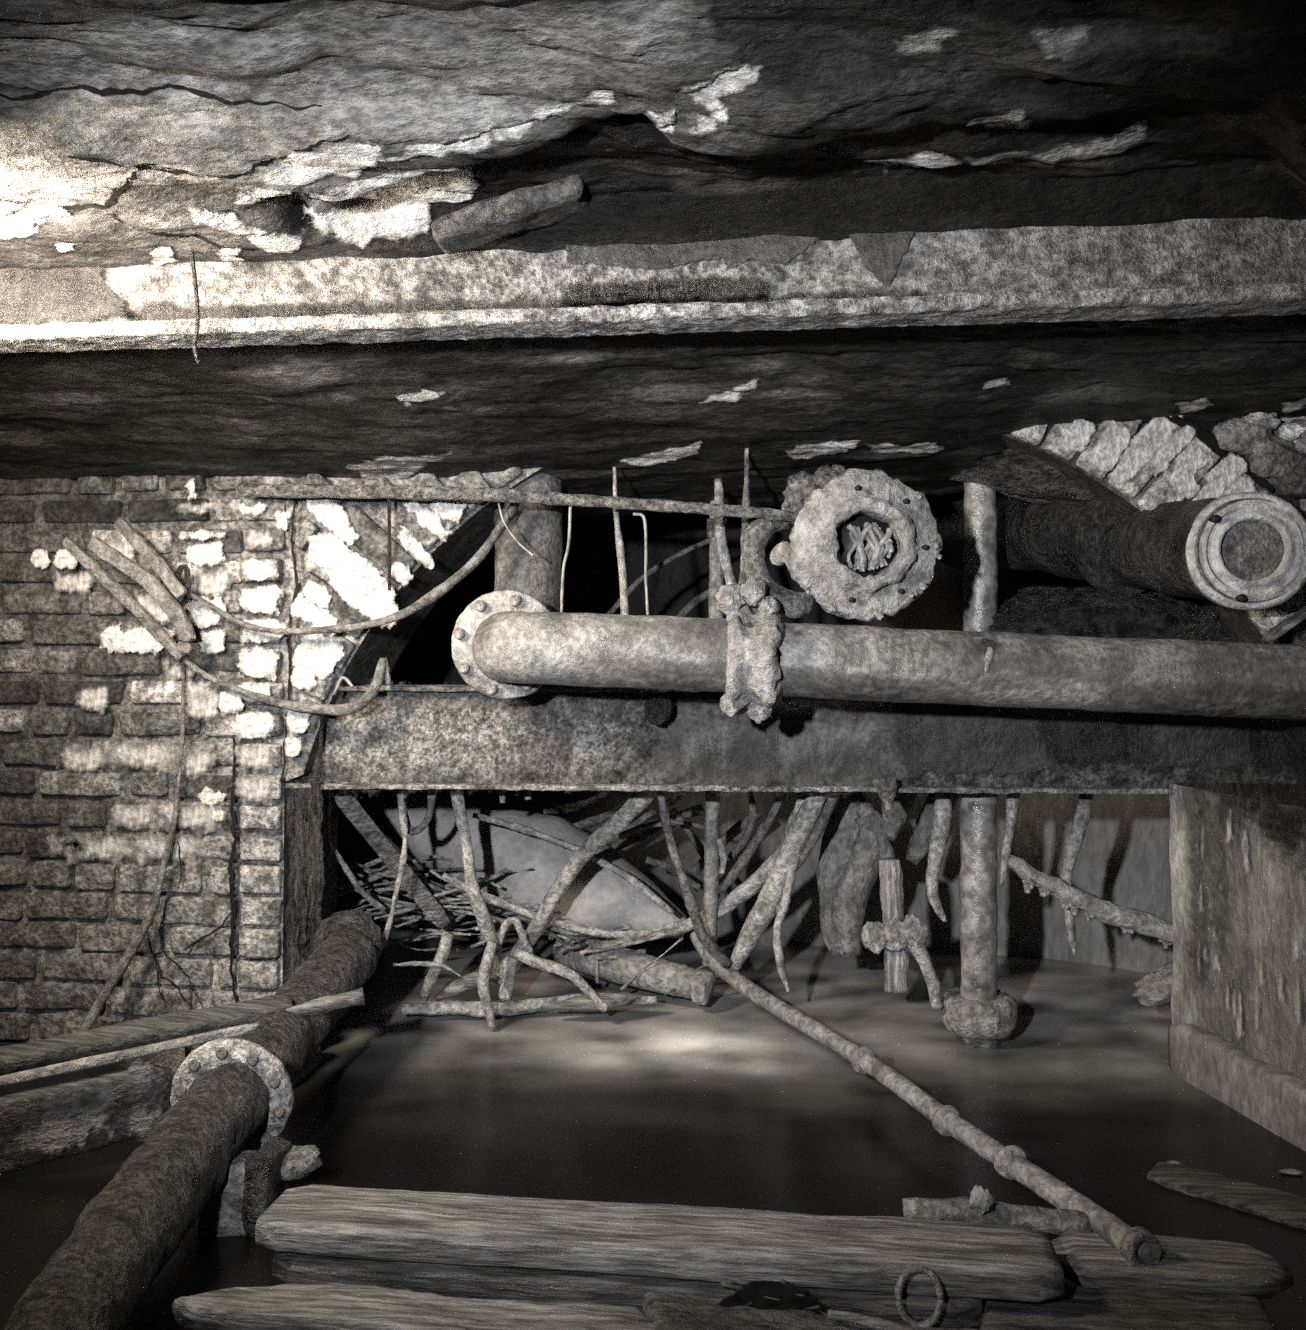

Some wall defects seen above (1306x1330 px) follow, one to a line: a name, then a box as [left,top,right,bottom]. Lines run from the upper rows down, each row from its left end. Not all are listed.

crack [0,83,322,111]
crack [4,135,350,251]
crack [280,499,299,782]
leakage [62,741,215,775]
rust [610,619,1125,811]
rust [1102,651,1306,772]
leakage [48,804,225,866]